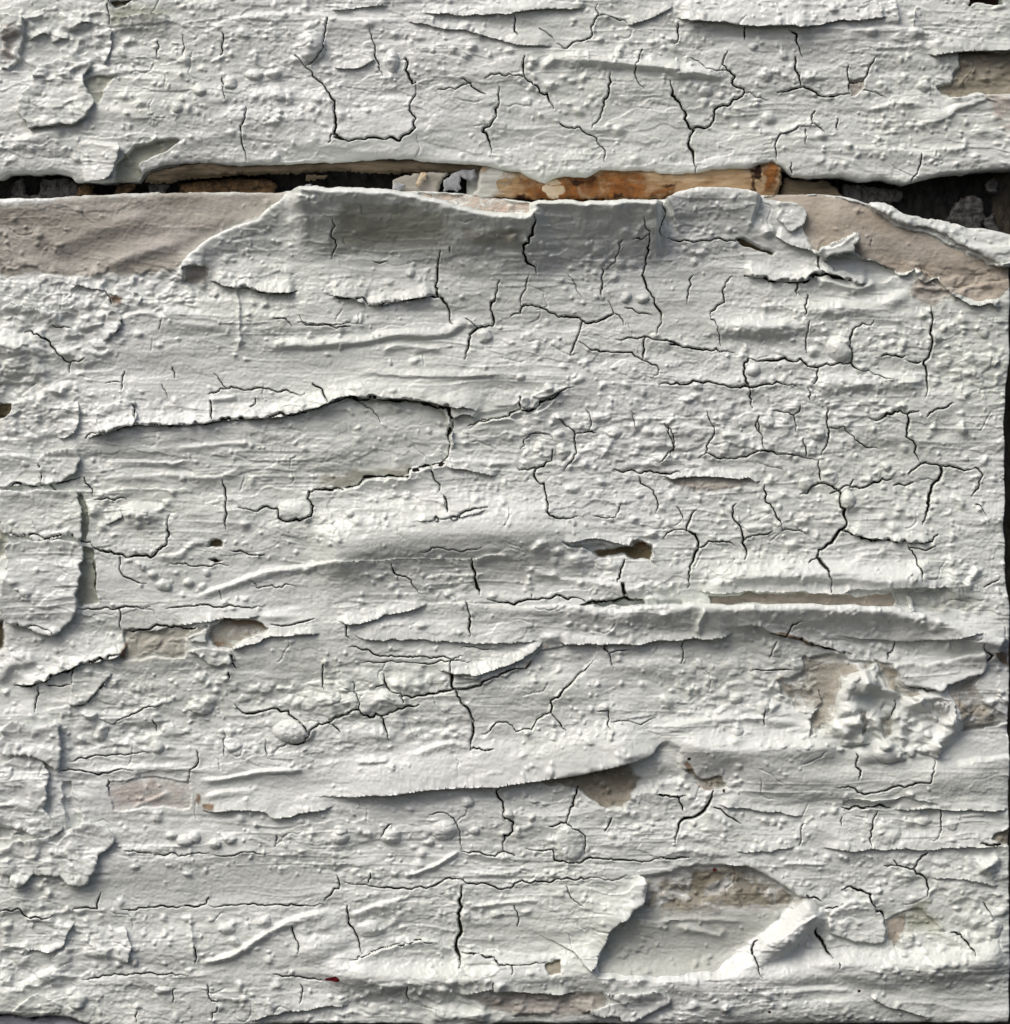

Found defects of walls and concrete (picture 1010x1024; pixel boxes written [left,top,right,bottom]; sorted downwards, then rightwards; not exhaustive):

crack [297,3,645,157]
crack [670,24,886,173]
peeling [930,26,1010,118]
peeling [0,168,1010,313]
crack [226,202,987,593]
crack [7,373,622,712]
peeling [210,618,317,649]
crack [237,547,642,756]
peeling [441,575,1009,755]
peeling [206,731,659,819]
crack [1,787,741,1004]
peeling [564,867,905,977]